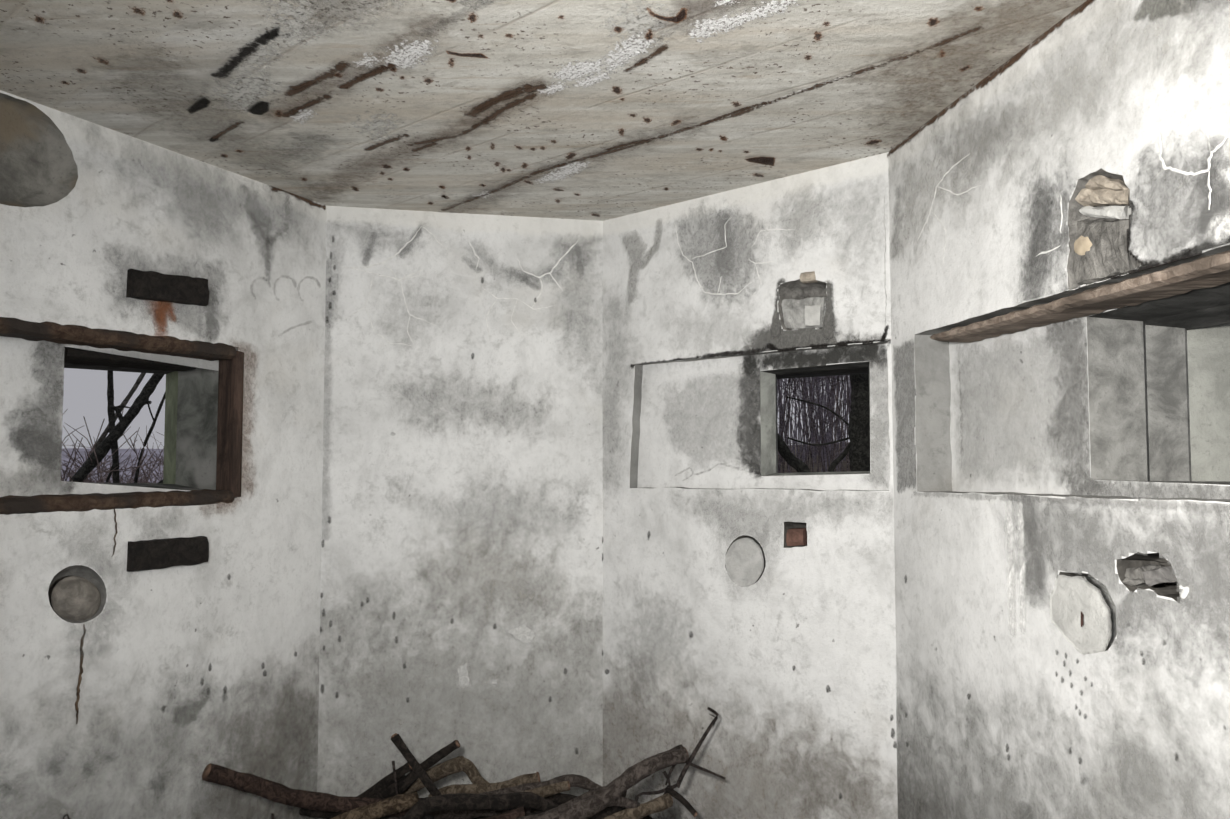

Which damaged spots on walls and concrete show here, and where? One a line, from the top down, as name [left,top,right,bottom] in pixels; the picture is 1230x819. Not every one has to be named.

leakage [352,37,438,71]
leakage [679,0,800,43]
leakage [878,0,1075,136]
leakage [1022,0,1200,141]
spalling [1067,168,1141,290]
crack [1063,128,1230,292]
corrosion [152,301,176,337]
spalling [778,271,827,330]
spalling [1117,552,1192,601]
crack [75,624,86,724]